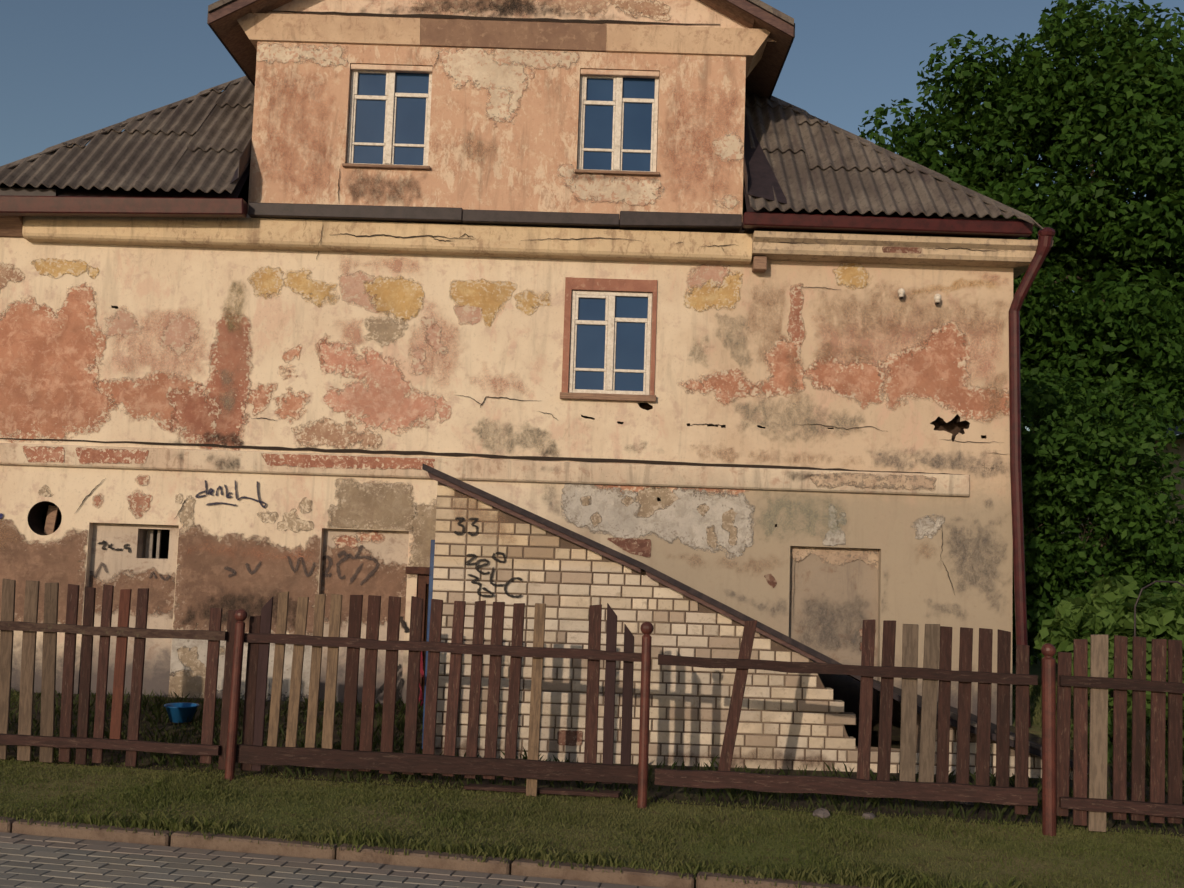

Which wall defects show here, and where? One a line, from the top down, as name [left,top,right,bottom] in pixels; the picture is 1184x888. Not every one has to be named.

leakage [442,0,568,17]
peeling [411,0,670,21]
crack [316,227,474,259]
peeling [450,279,551,327]
peeling [683,264,743,312]
peeling [677,284,1009,442]
crack [459,395,556,419]
peeling [0,258,452,701]
peeling [561,484,755,558]